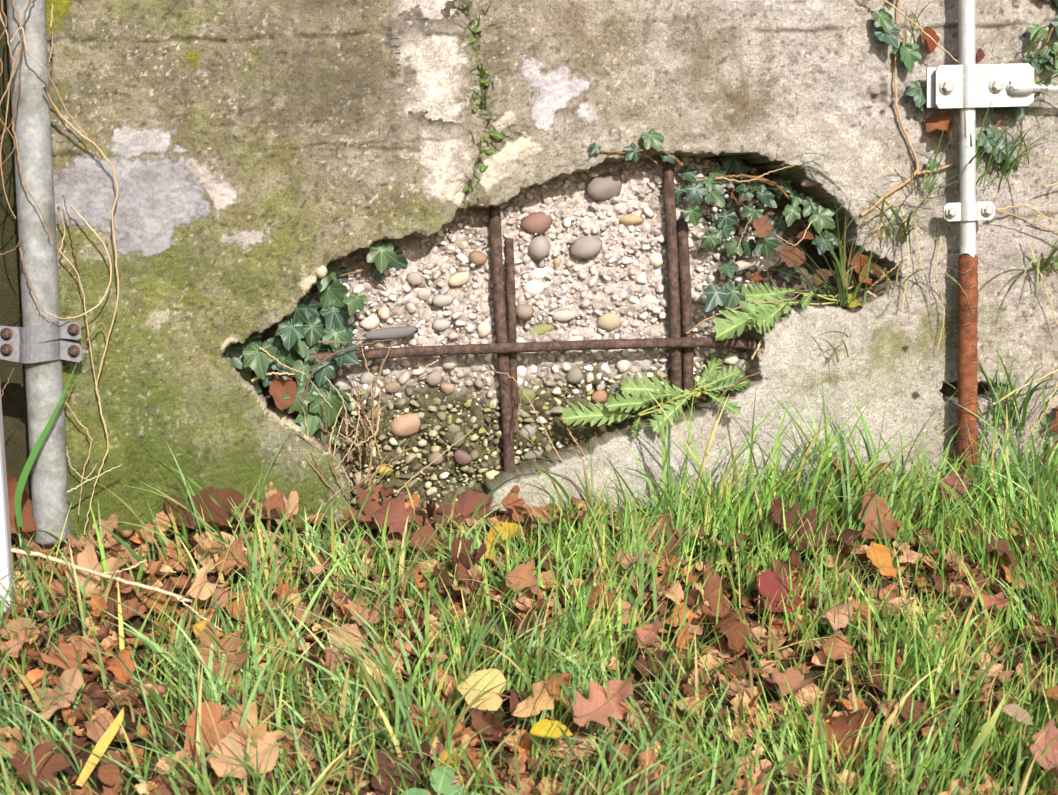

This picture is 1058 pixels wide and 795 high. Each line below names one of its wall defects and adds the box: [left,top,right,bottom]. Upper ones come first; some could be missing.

damp [389,0,474,202]
peeling [53,125,237,257]
damp [132,310,170,330]
spalling [220,56,904,515]
spalling [939,380,958,407]
corrosion [953,253,978,494]
spalling [977,380,1007,401]